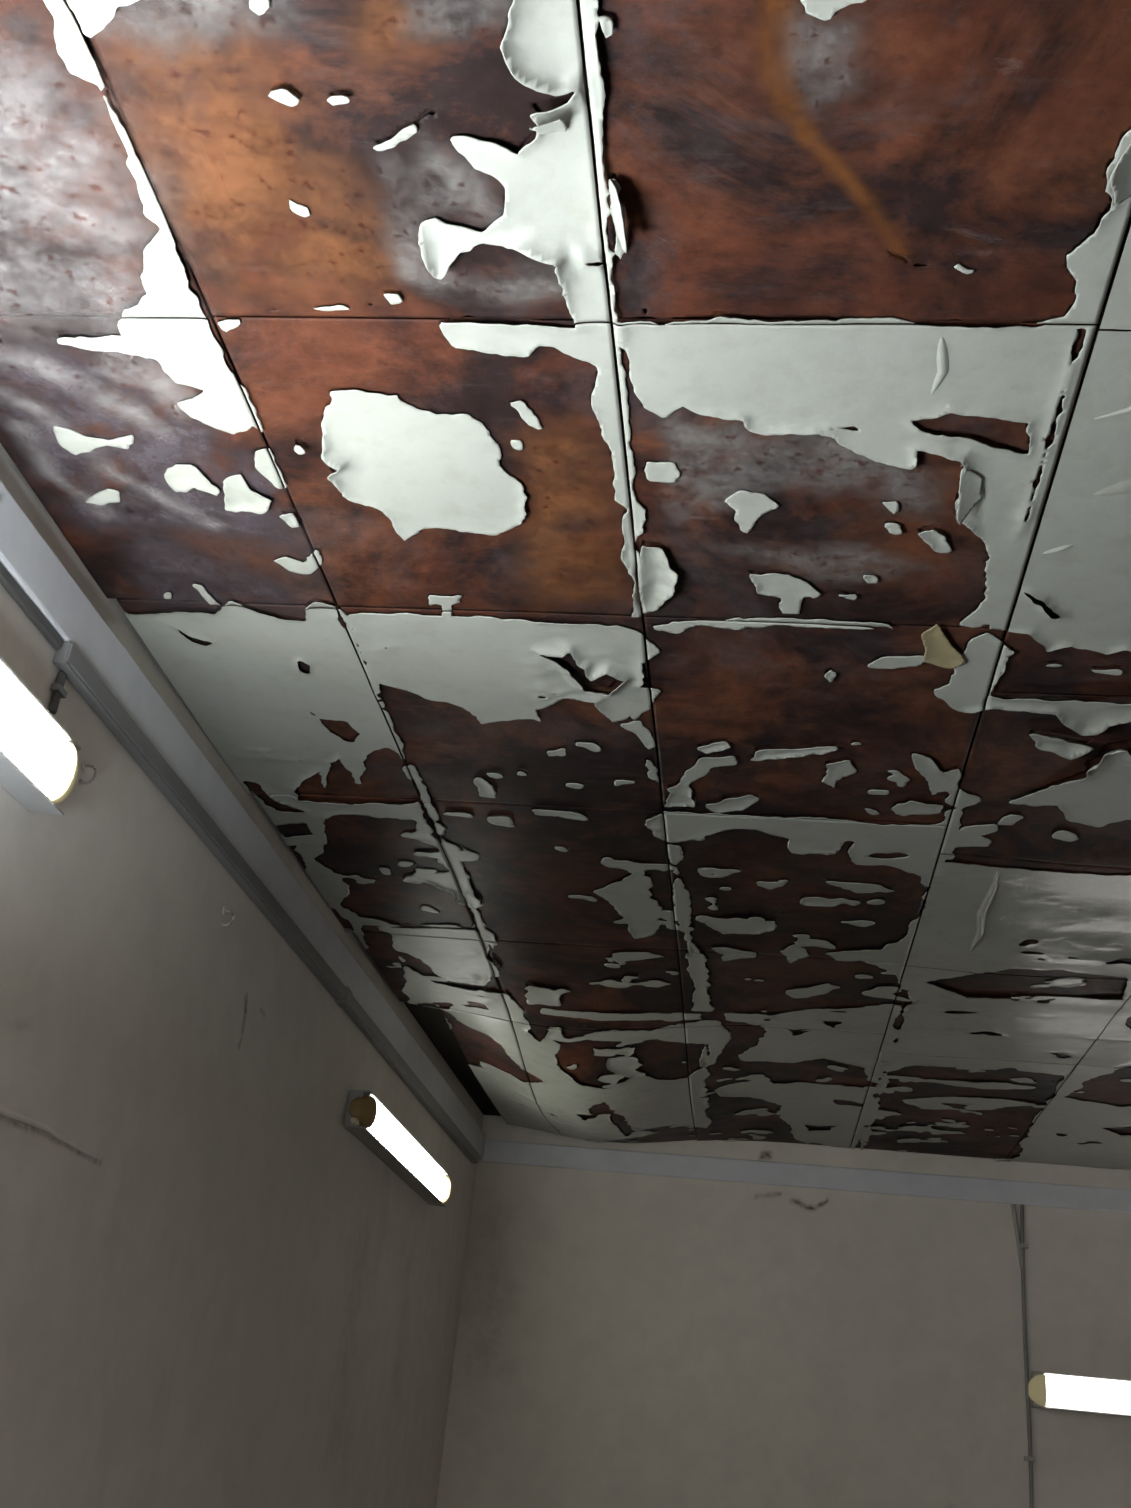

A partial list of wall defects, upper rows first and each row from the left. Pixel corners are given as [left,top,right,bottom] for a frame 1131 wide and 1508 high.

peeling [0,0,1131,1161]